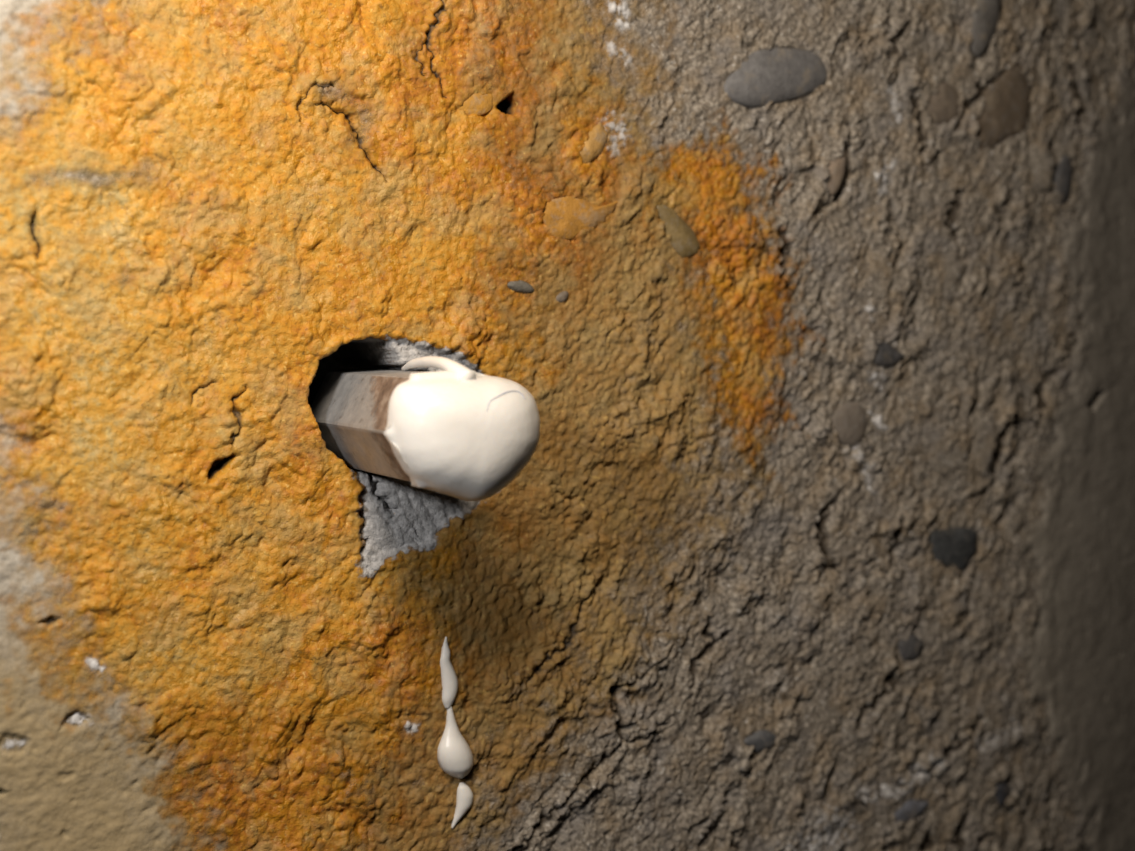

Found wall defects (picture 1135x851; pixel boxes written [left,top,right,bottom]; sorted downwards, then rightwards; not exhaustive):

spalling [310,82,347,105]
crack [297,84,381,173]
spalling [34,164,150,187]
spalling [380,335,482,374]
rust [0,0,806,851]
spalling [445,0,1135,851]
spalling [351,468,480,577]
leakage [440,637,458,708]